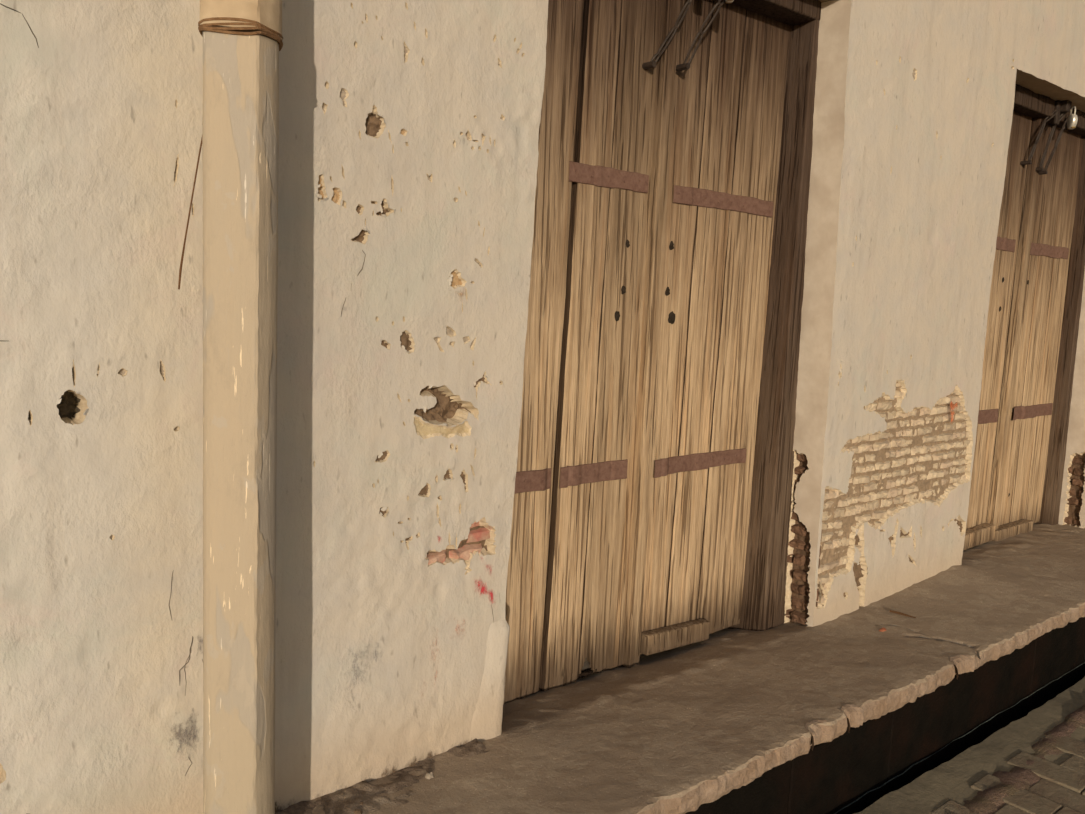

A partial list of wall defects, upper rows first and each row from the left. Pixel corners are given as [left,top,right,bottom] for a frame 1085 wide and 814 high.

crack [1,4,39,48]
spalling [397,326,503,452]
spalling [379,507,420,550]
flaking render [407,448,496,575]
flaking render [784,370,973,626]
flaking render [1062,451,1085,527]